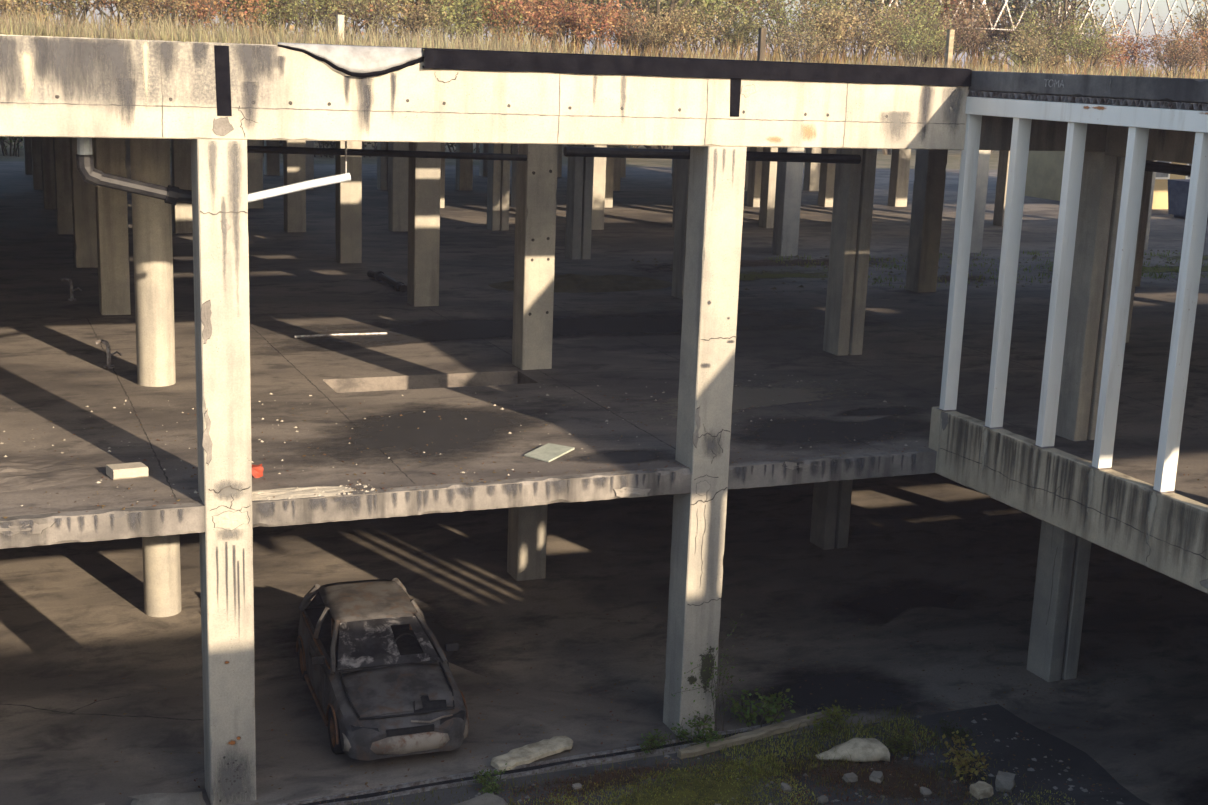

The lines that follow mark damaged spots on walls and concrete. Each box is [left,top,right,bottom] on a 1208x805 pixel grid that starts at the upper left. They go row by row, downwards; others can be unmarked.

water stain [0,35,173,116]
water stain [193,43,207,62]
water stain [237,44,284,122]
water stain [345,76,371,121]
crack [209,486,251,511]
water stain [311,494,377,512]
water stain [313,406,539,462]
water stain [489,450,675,496]
crack [687,425,730,606]
crack [940,448,1208,562]
water stain [947,416,1208,552]
water stain [216,530,245,614]